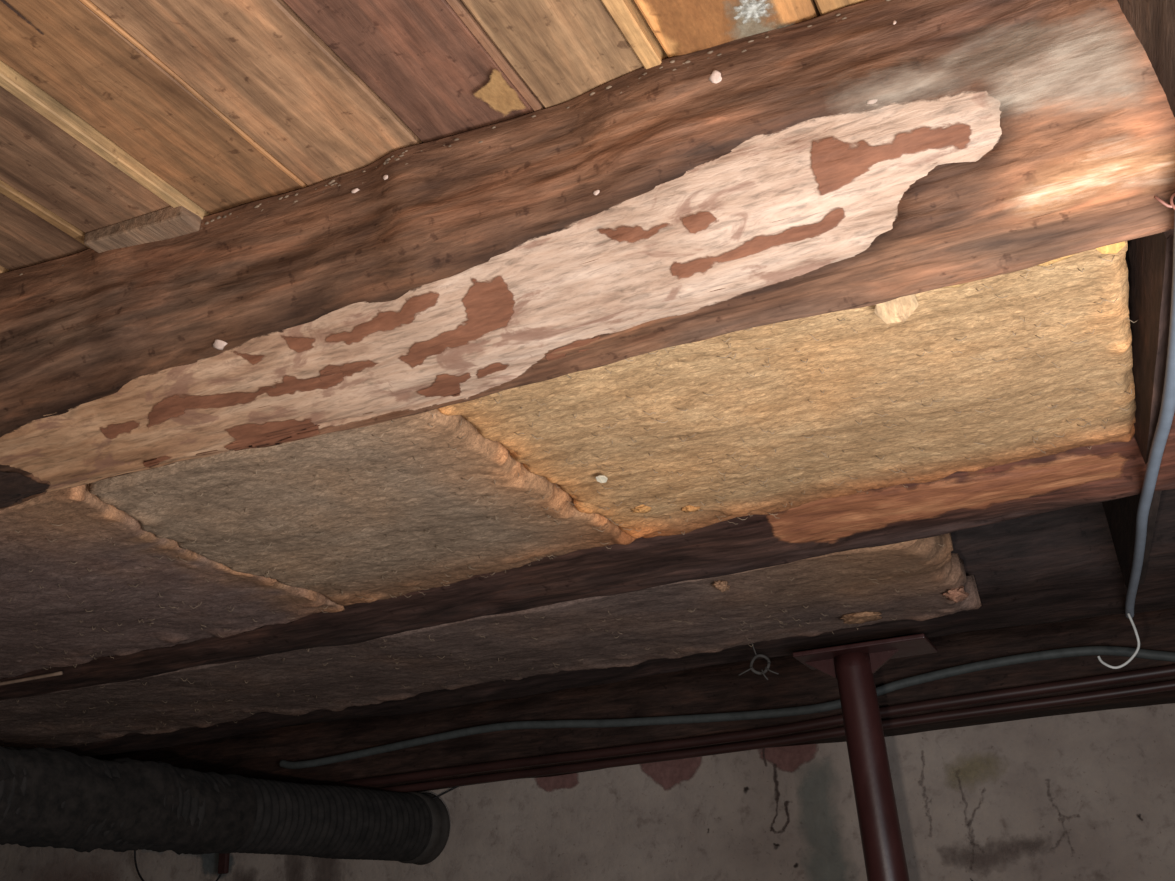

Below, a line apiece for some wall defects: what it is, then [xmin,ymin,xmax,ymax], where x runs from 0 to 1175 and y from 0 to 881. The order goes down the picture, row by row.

leakage [645,0,777,55]
peeling [0,33,1127,493]